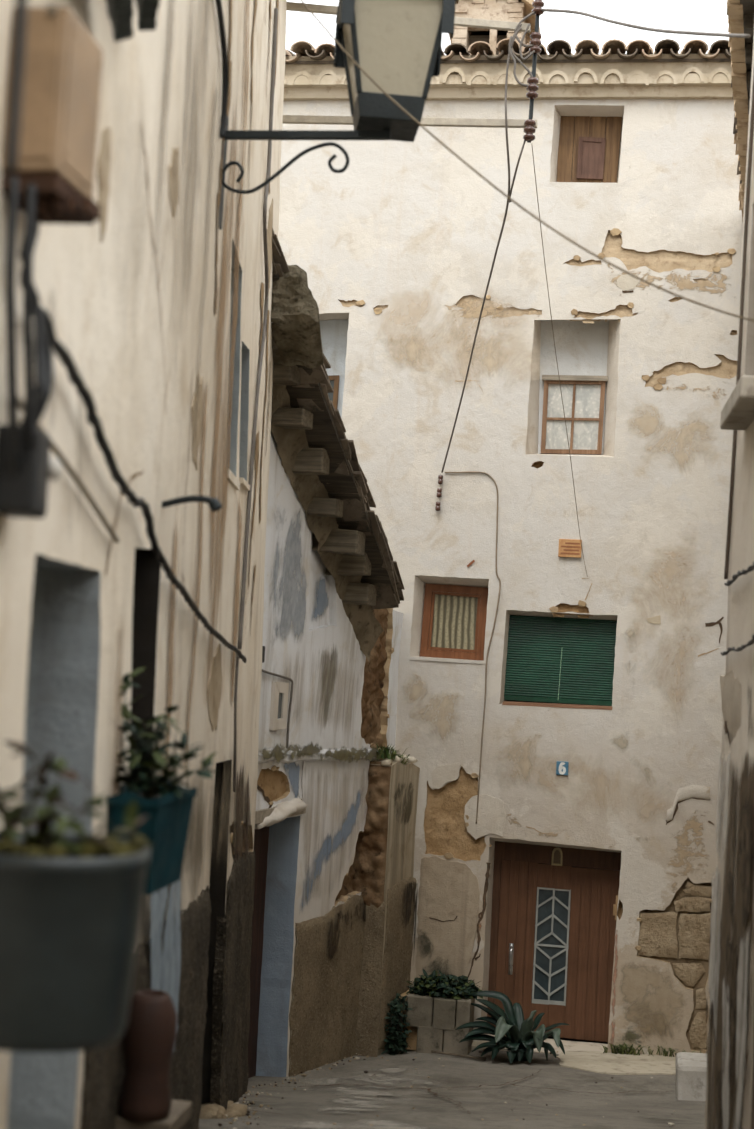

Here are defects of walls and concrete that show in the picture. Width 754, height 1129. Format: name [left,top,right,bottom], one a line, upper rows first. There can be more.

flaking render [564,228,736,282]
flaking render [455,295,542,318]
flaking render [570,302,638,323]
flaking render [641,354,737,390]
flaking render [549,600,592,618]
flaking render [257,766,290,805]
flaking render [423,766,492,861]
flaking render [613,895,623,920]
flaking render [635,877,712,1053]